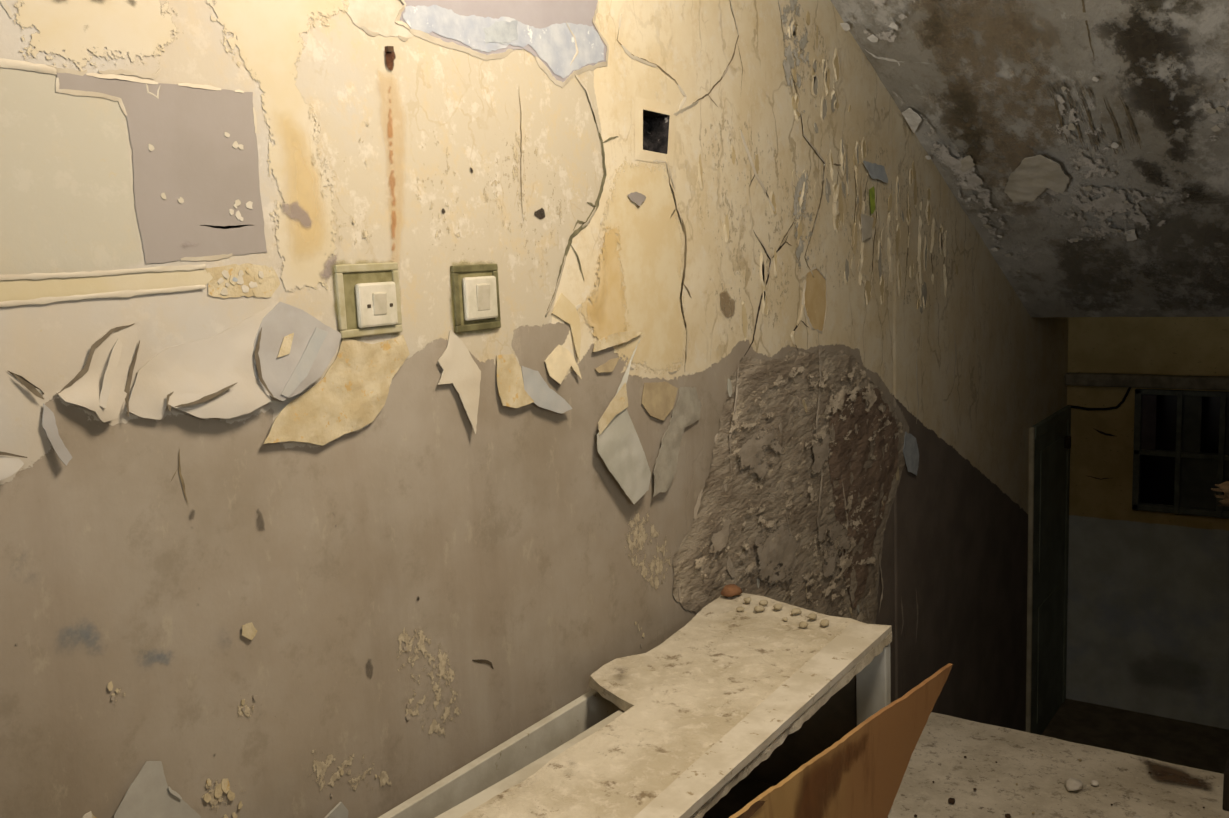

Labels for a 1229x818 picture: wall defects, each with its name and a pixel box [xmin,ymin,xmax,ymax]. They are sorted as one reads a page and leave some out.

peeling [0,0,609,466]
corrosion [385,46,396,70]
crack [545,74,618,317]
peeling [496,97,702,504]
crack [666,157,691,365]
crack [617,0,743,116]
crack [740,71,846,359]
spalling [662,0,1189,624]
damp [920,0,1051,209]
damp [1103,0,1205,200]
peeling [0,451,27,480]
peeling [114,761,246,818]